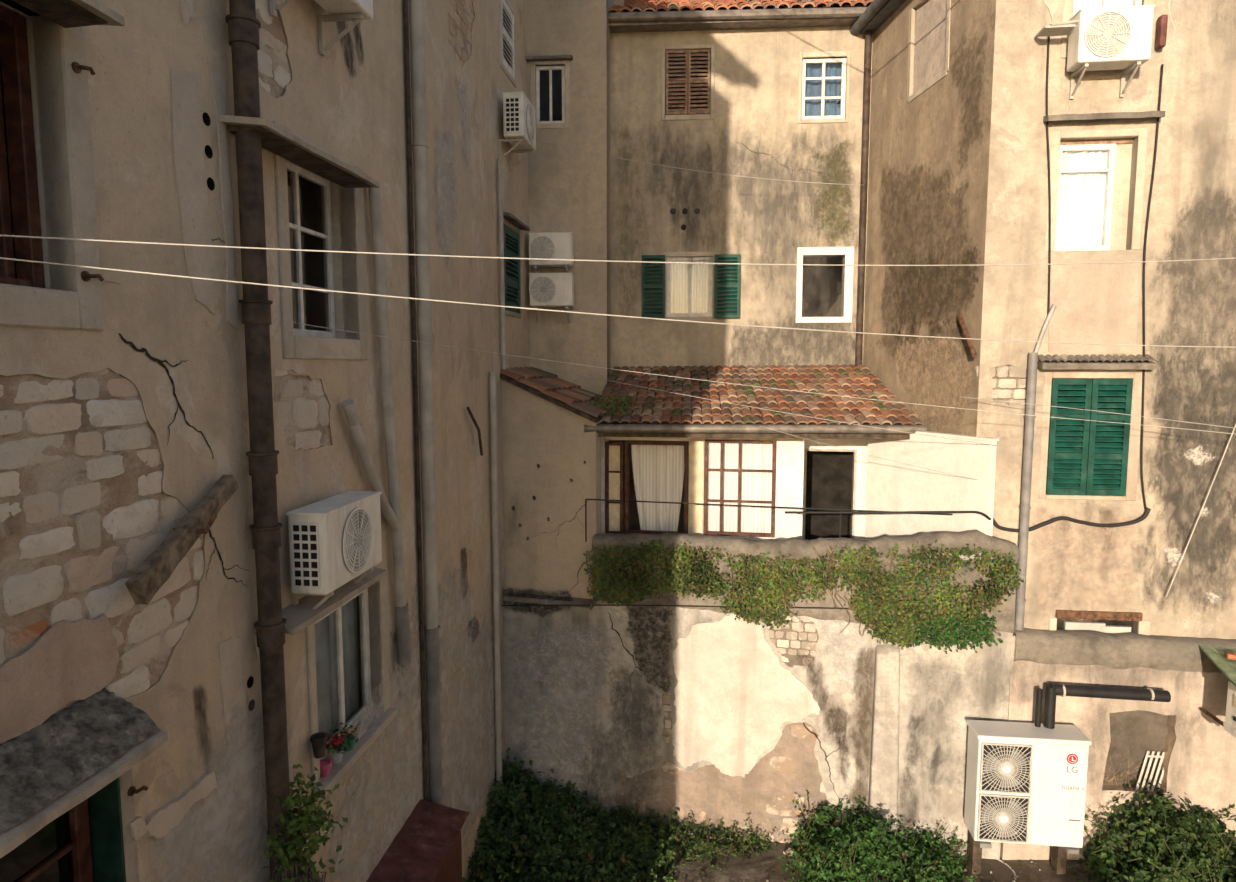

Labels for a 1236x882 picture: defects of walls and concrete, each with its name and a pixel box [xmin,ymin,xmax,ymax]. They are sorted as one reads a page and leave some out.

flaking render [255,0,291,98]
water stain [820,148,851,240]
water stain [731,321,856,366]
crack [119,333,214,459]
water stain [1146,196,1236,607]
flaking render [0,368,204,744]
crack [206,529,248,588]
peeling [219,632,265,794]
water stain [627,606,672,690]
peeling [671,614,820,777]
peeling [128,771,217,840]